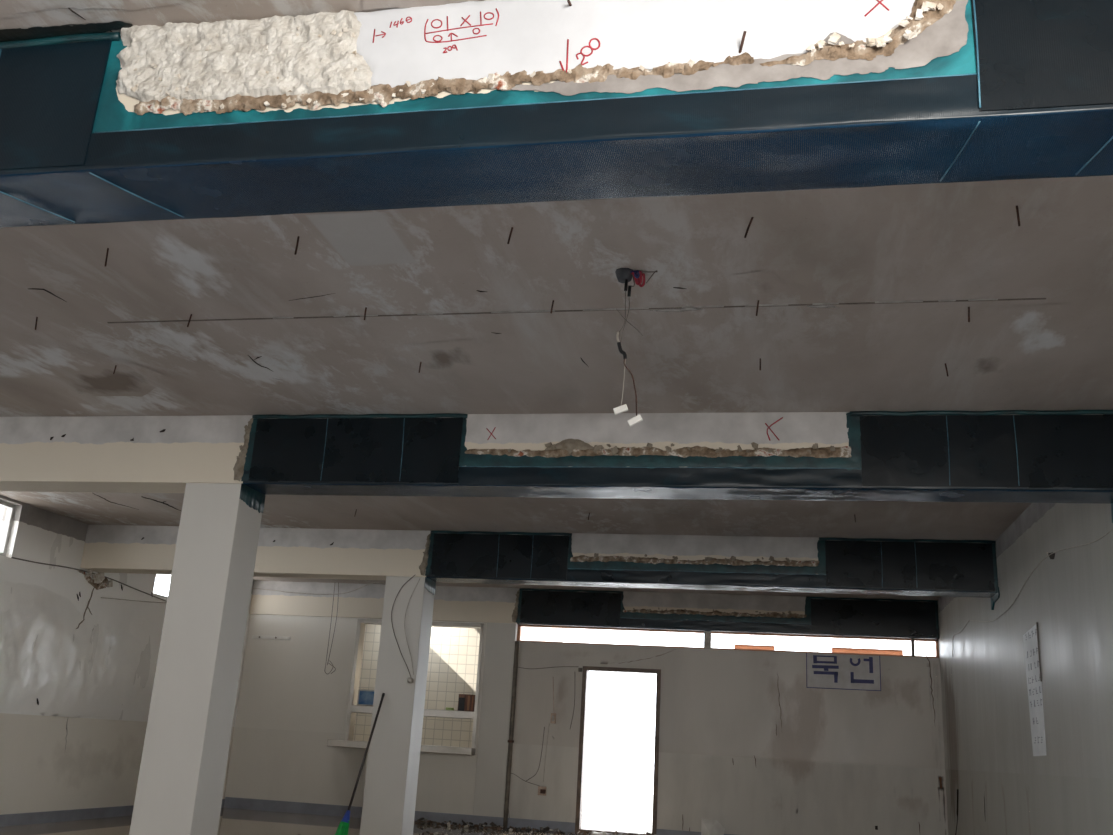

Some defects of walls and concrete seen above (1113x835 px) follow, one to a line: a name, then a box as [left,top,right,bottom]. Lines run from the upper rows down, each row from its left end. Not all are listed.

spalling [134,0,956,116]
spalling [465,439,851,458]
spalling [570,553,819,567]
flaking render [77,569,113,590]